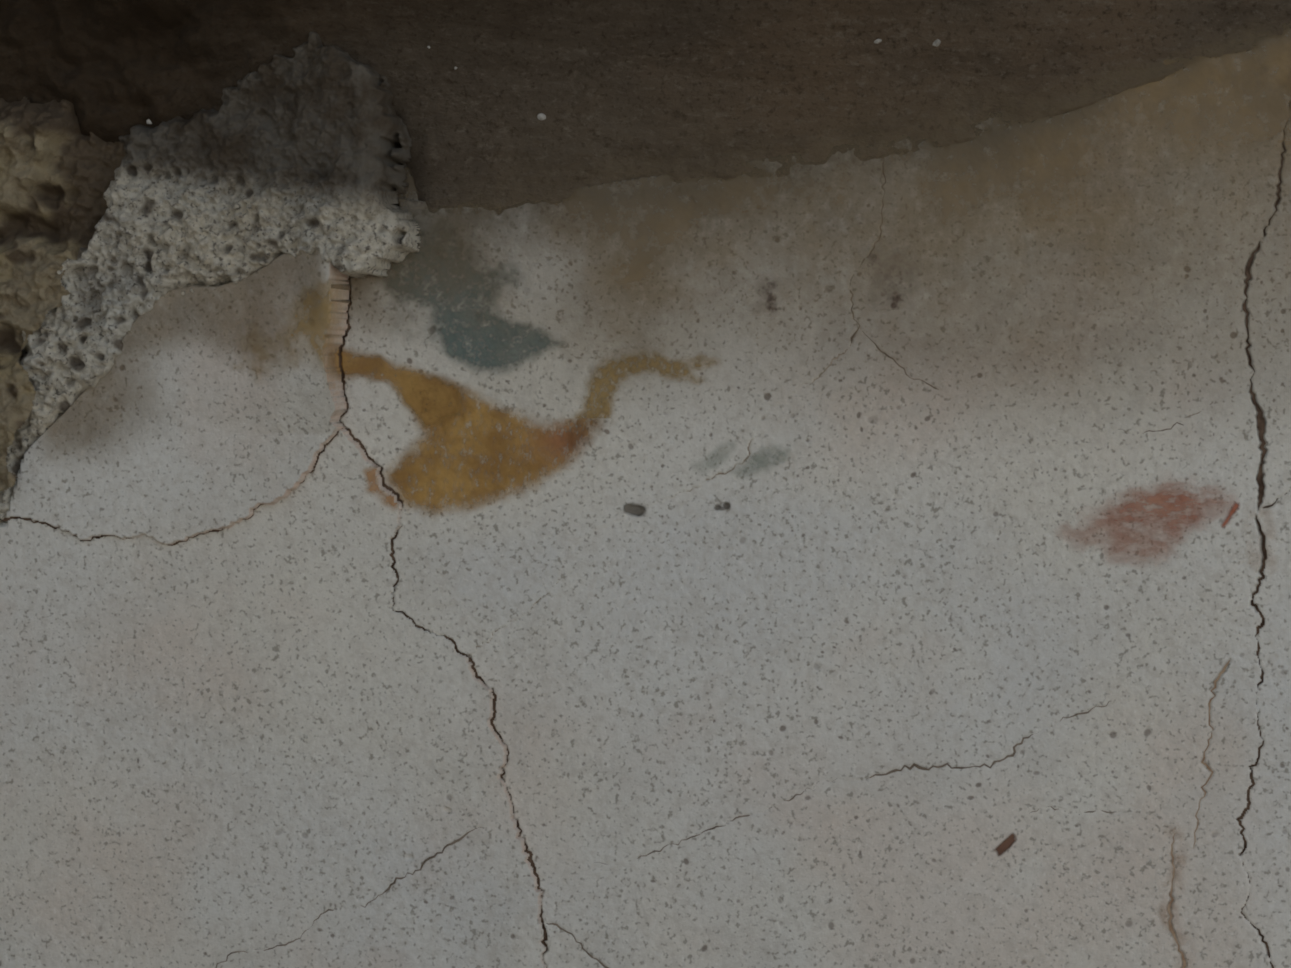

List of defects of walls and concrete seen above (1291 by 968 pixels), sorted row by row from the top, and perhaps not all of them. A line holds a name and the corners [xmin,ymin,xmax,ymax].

spalling [0,31,421,523]
crack [0,517,129,541]
crack [168,504,262,546]
crack [291,276,608,968]
crack [1118,133,1290,968]
crack [637,702,1114,859]
crack [216,827,483,968]